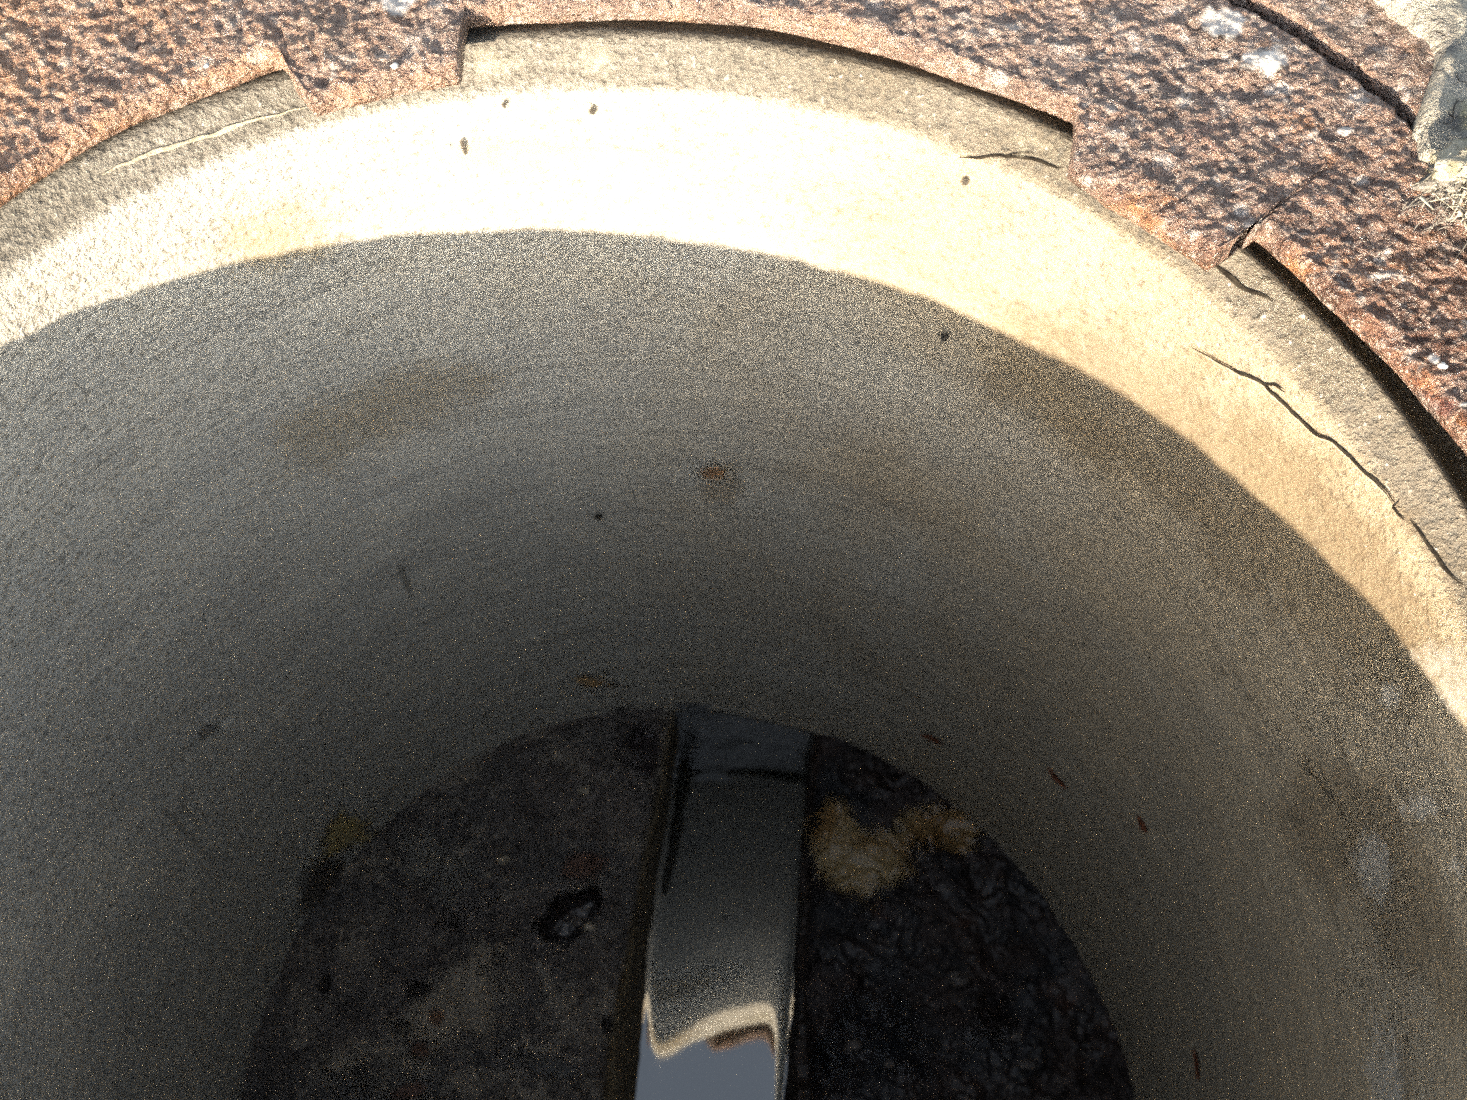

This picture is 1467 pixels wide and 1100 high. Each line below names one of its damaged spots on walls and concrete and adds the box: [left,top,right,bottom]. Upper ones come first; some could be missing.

crack [959,152,1064,168]
crack [1216,266,1274,301]
crack [1192,348,1464,585]